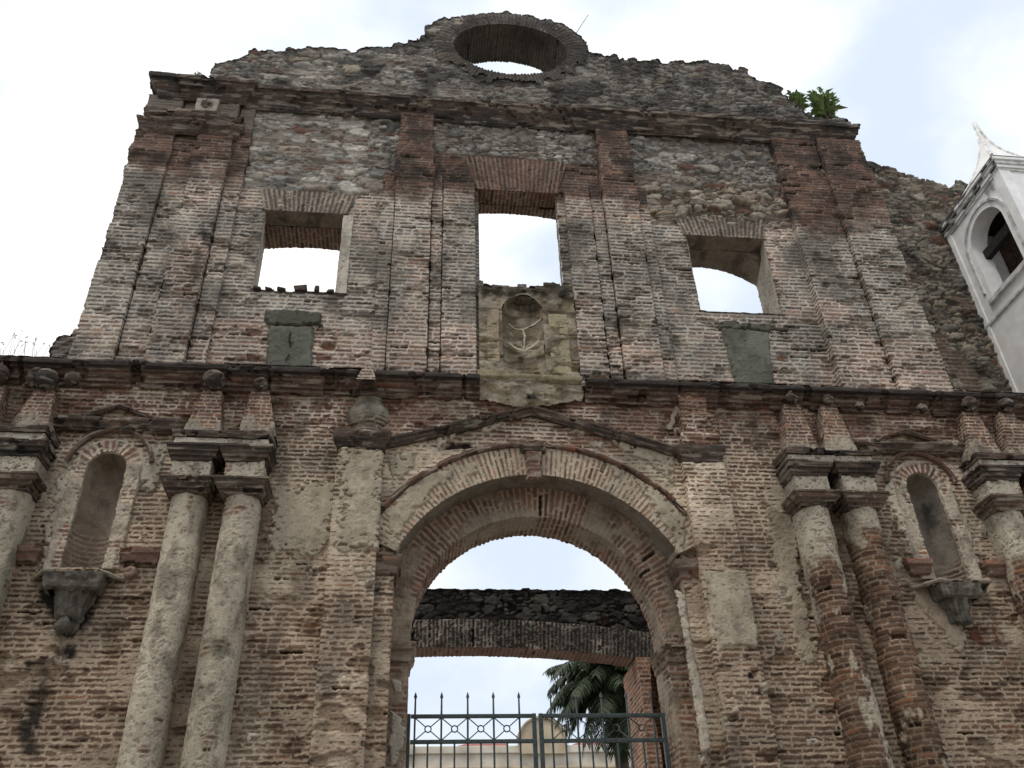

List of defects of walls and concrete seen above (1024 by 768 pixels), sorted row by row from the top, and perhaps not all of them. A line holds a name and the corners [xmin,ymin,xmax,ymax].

peeling [758,500,818,667]
damp [19,670,47,755]